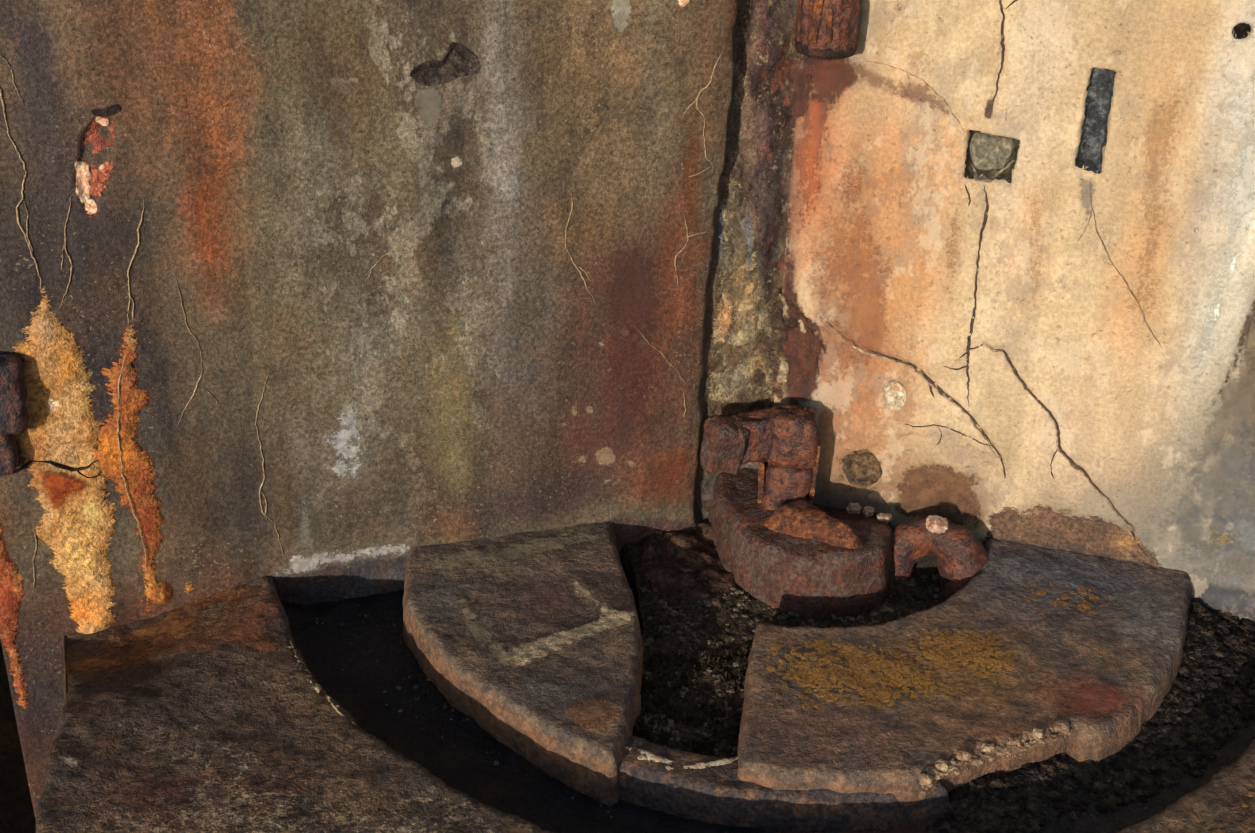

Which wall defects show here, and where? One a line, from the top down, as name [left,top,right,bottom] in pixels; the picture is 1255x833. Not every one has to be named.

spalling [408,42,480,86]
crack [853,57,966,133]
crack [990,0,1018,115]
spalling [73,104,121,218]
leakage [1196,114,1255,367]
crack [778,184,1161,560]
leakage [1214,301,1255,403]
corrosion [809,438,821,501]
leakage [1177,445,1255,566]